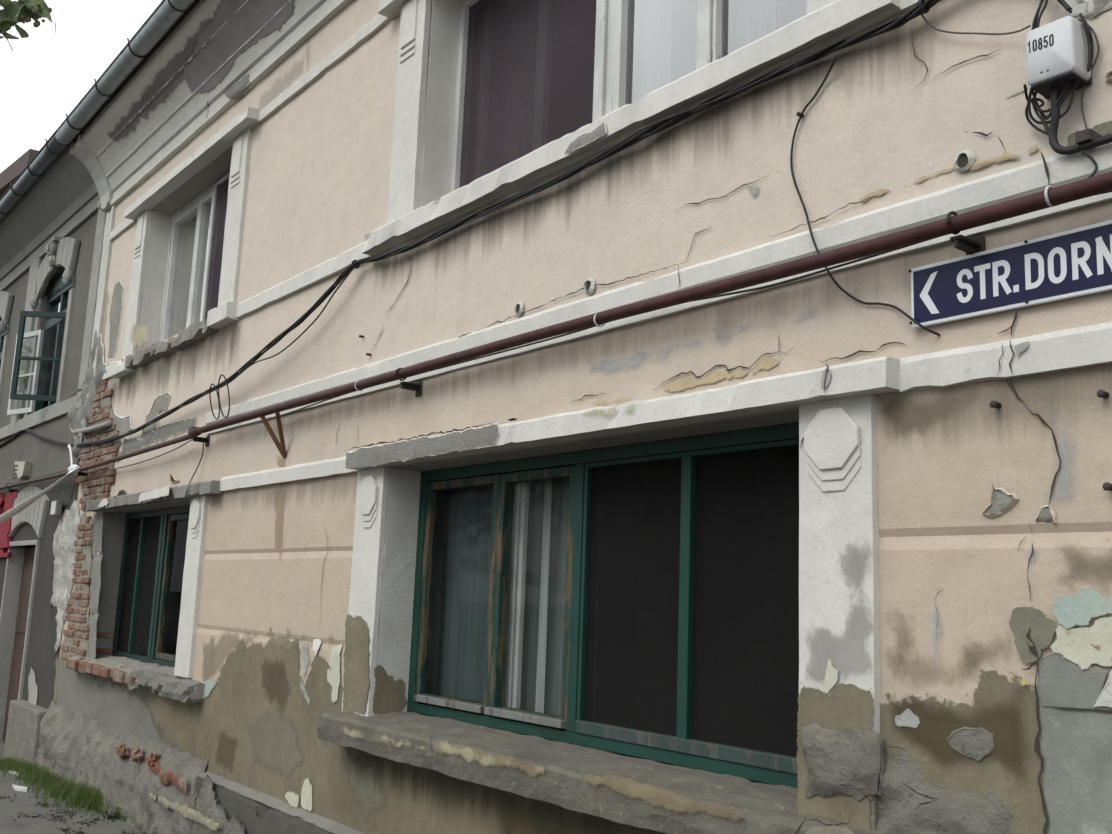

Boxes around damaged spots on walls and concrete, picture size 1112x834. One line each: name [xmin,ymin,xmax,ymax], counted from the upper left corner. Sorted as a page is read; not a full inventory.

spalling [183,0,294,94]
damp [434,192,542,258]
crack [458,171,782,338]
crack [653,342,906,392]
flaking render [50,379,197,671]
crack [997,311,1061,601]
peeling [312,639,342,703]
damp [53,614,663,834]
damp [796,543,1045,834]
damp [995,607,1056,664]
crack [1022,628,1112,834]
peeling [1027,588,1112,709]